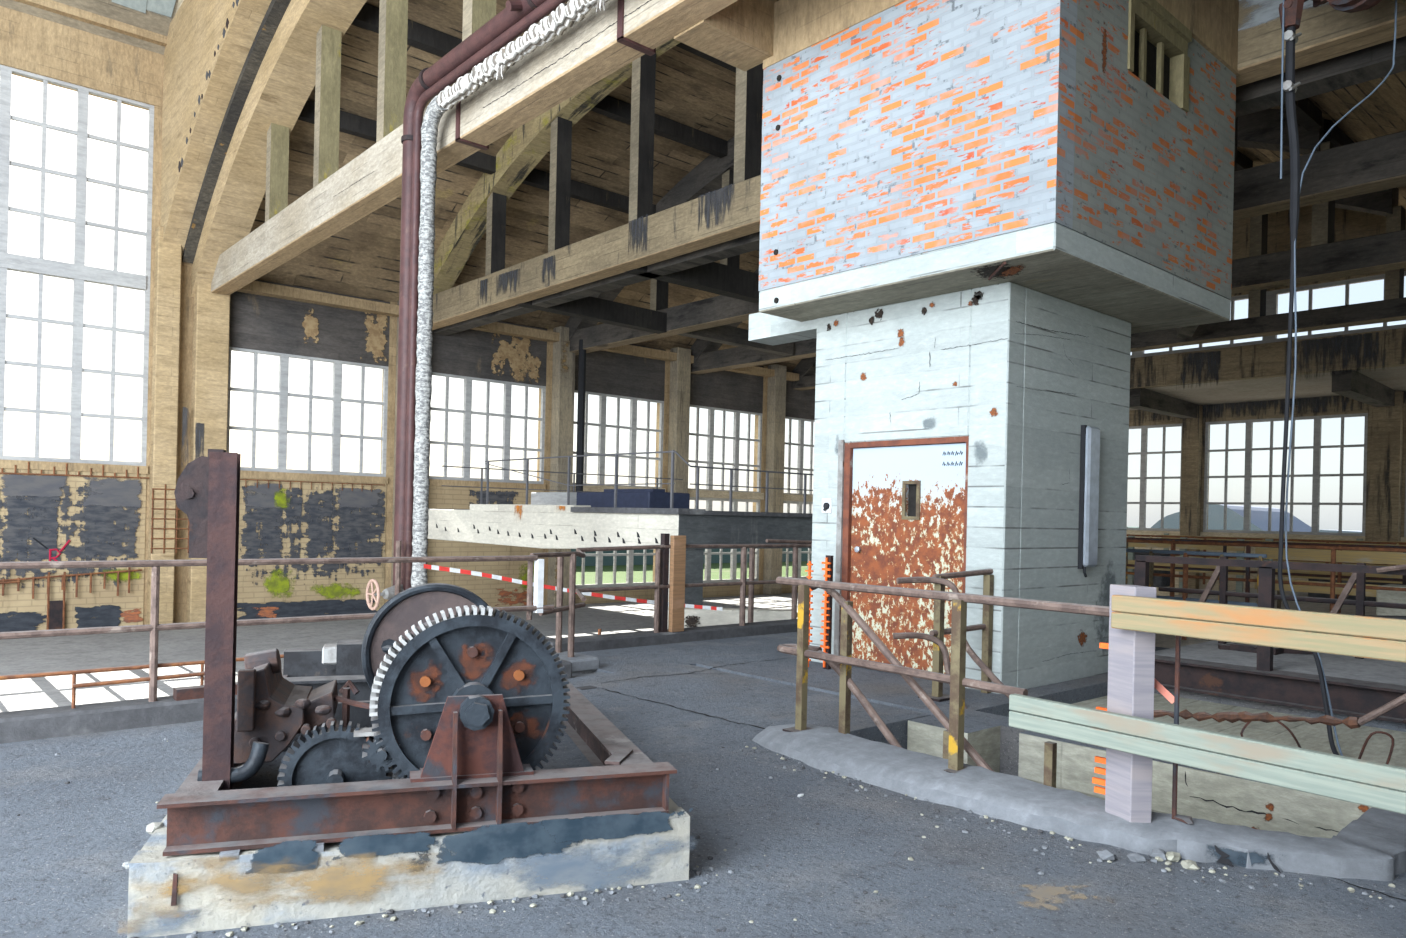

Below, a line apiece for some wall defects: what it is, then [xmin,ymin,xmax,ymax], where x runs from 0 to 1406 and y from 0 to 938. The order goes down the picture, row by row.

damp [698,183,735,228]
damp [628,214,648,252]
damp [478,268,520,304]
damp [542,255,555,282]
damp [1180,351,1221,388]
damp [1285,331,1387,379]
damp [1201,396,1364,418]
peeling [0,462,189,632]
peeling [240,479,385,585]
peeling [237,599,379,620]